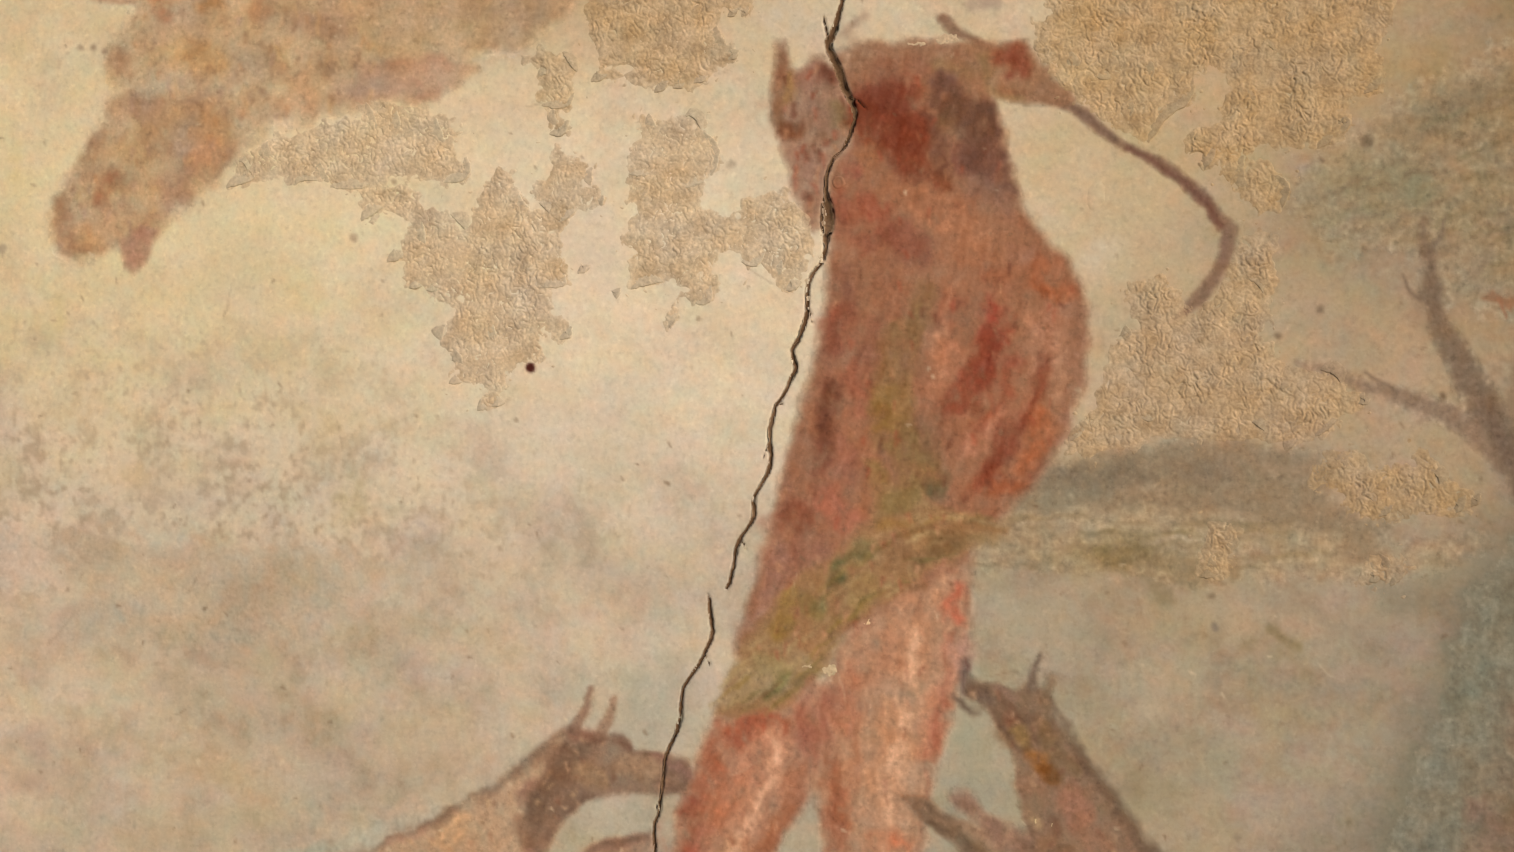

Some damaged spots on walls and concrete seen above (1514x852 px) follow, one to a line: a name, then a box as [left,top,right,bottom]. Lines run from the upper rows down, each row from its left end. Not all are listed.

flaking render [226,0,827,412]
crack [652,0,865,852]
flaking render [1030,0,1482,599]